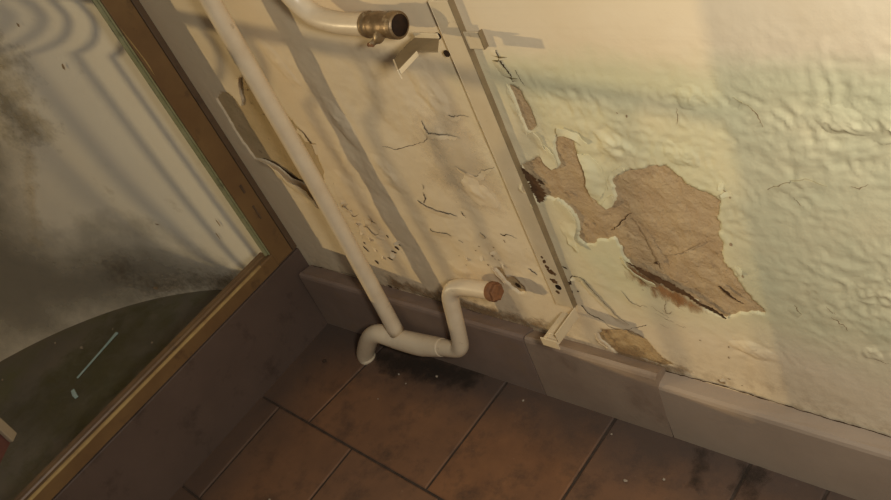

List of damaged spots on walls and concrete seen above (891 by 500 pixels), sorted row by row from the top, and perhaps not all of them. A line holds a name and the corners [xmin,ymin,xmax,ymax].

flaking render [218,77,318,209]
crack [382,120,461,150]
peeling [286,113,400,264]
crack [417,194,513,243]
peeling [506,84,765,319]
crack [569,276,683,330]
damp [376,353,474,387]
spalling [595,329,672,365]